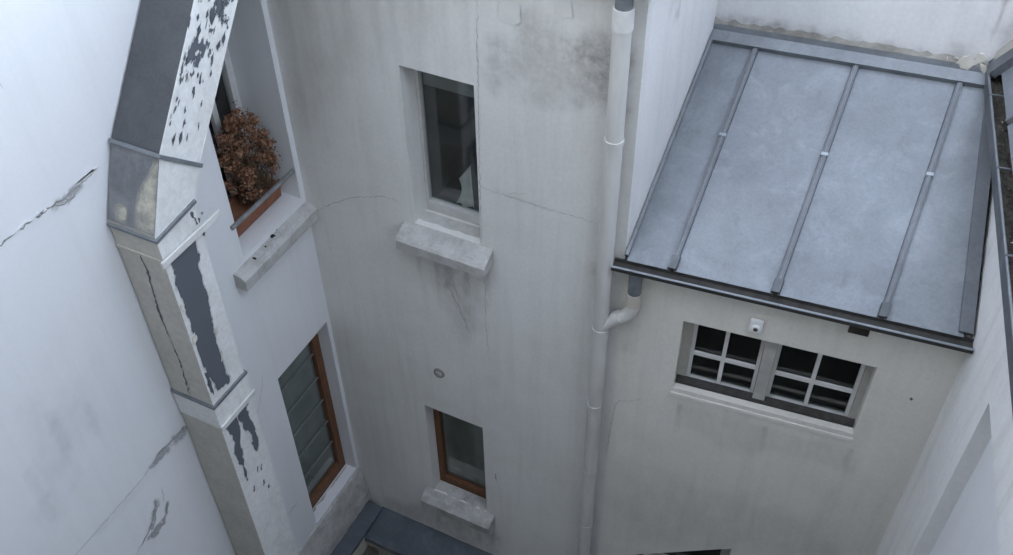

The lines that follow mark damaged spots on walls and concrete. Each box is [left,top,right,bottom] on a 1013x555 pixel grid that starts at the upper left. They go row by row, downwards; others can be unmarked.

peeling [169,0,234,145]
crack [0,167,99,246]
peeling [171,212,230,395]
crack [77,427,186,553]
peeling [226,404,271,492]